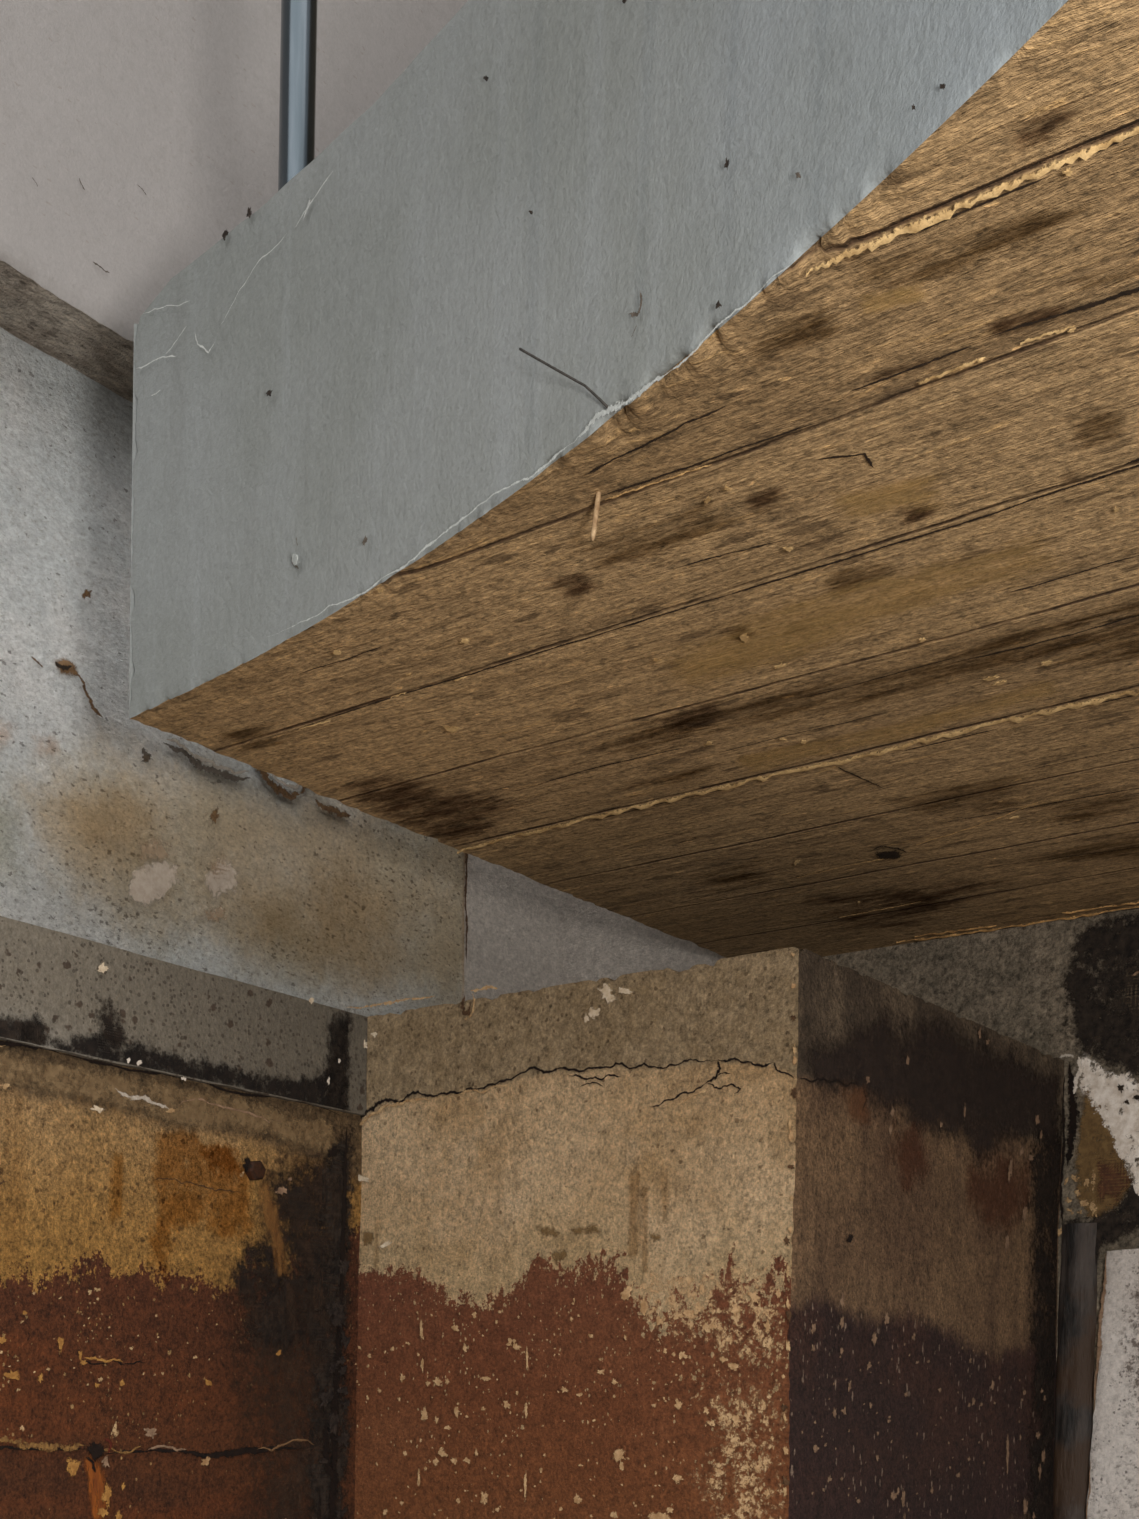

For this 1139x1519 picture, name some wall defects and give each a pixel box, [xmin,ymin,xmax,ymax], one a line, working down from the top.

spalling [55,659,77,675]
peeling [129,842,177,904]
rust [259,1184,285,1274]
water stain [806,914,1139,1519]
crack [0,1040,867,1519]
peeling [0,1336,54,1391]
peeling [57,1288,125,1388]
rust [66,1455,126,1519]